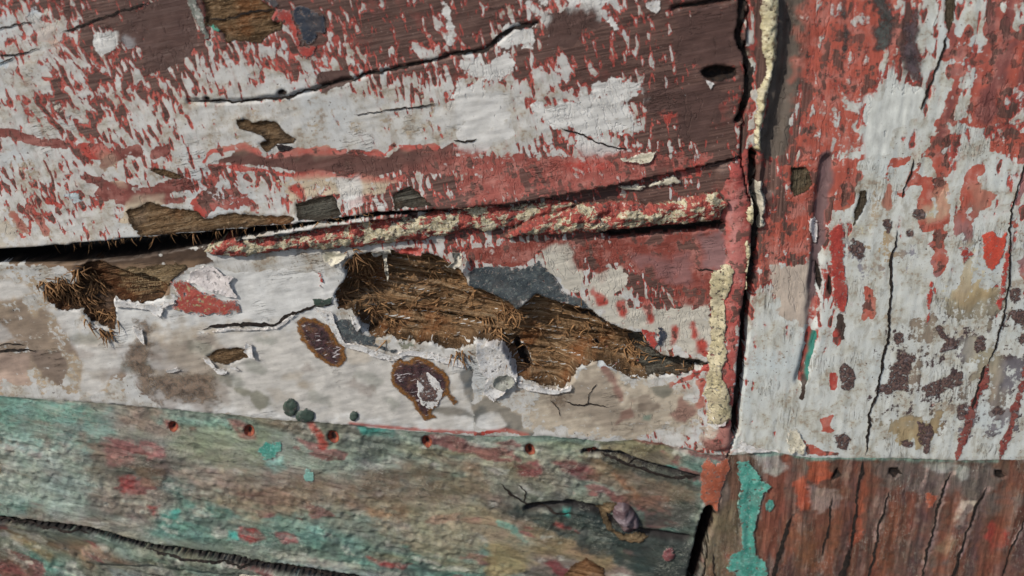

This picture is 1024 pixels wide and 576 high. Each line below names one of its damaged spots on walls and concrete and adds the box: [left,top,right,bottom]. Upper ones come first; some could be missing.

peeling [187,0,326,59]
crack [188,22,537,103]
crack [355,104,433,115]
spalling [313,245,705,402]
peeling [417,372,443,409]
crack [551,384,608,415]
crack [821,233,897,576]
crack [922,166,1024,576]
crack [602,452,696,479]
crack [503,485,576,515]
crack [145,548,348,576]
crack [772,515,792,576]